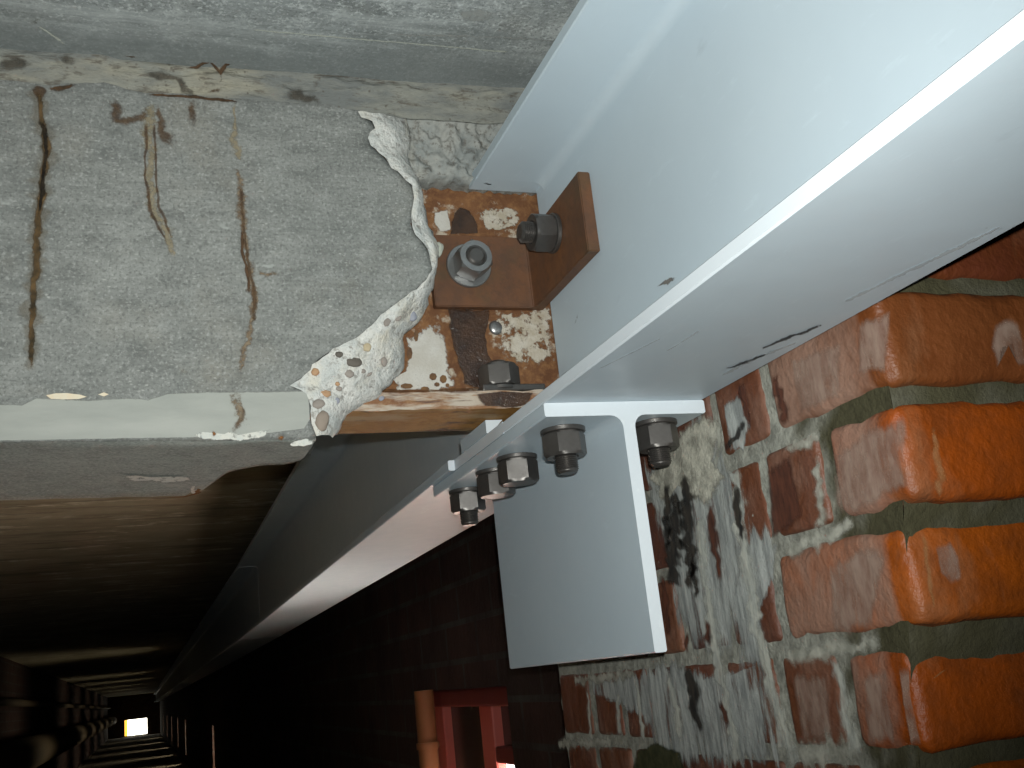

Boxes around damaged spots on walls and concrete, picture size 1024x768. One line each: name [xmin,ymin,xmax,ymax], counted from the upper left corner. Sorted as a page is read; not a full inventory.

corrosion [111,103,146,124]
corrosion [451,208,478,234]
spalling [290,111,537,446]
corrosion [448,309,532,407]
efflorescence [860,316,888,370]
damp [773,376,788,423]
peeling [195,429,269,441]
damp [559,384,904,768]